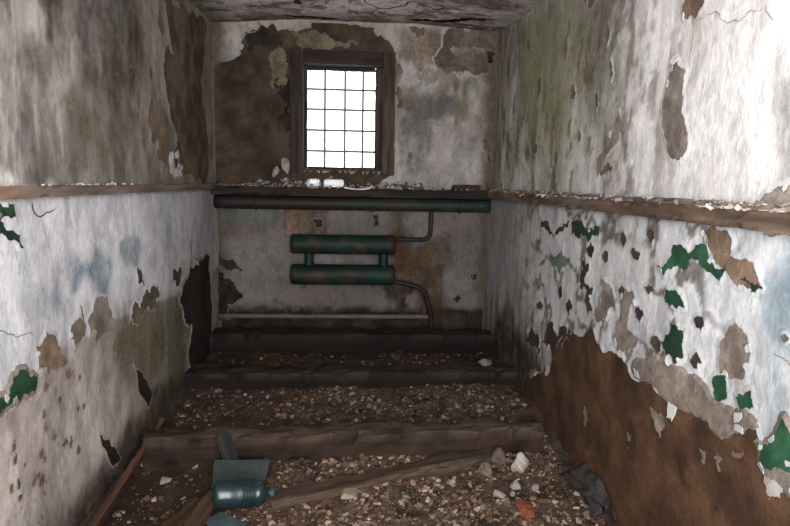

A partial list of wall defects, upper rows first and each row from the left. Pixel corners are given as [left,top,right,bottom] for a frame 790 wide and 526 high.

flaking render [681,0,708,25]
crack [690,5,773,54]
flaking render [135,0,661,204]
peeling [660,52,692,166]
peeling [688,177,790,213]
flaking render [129,264,160,327]
flaking render [171,227,246,368]
peeling [0,292,118,417]
flaking render [132,362,153,410]
flaking render [521,215,790,526]
flaking render [43,409,80,454]
flaking render [97,431,122,470]